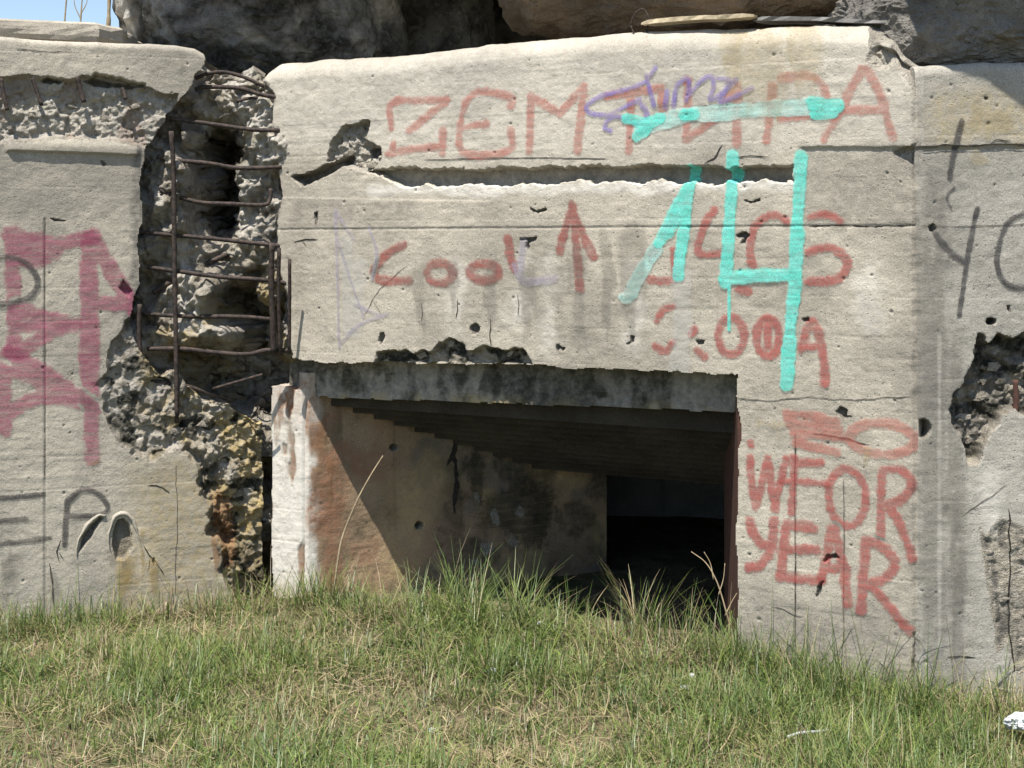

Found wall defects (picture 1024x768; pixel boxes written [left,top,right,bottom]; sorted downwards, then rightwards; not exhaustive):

spalling [0,68,382,603]
spalling [373,323,533,365]
spalling [949,331,1024,466]
crack [447,440,460,514]